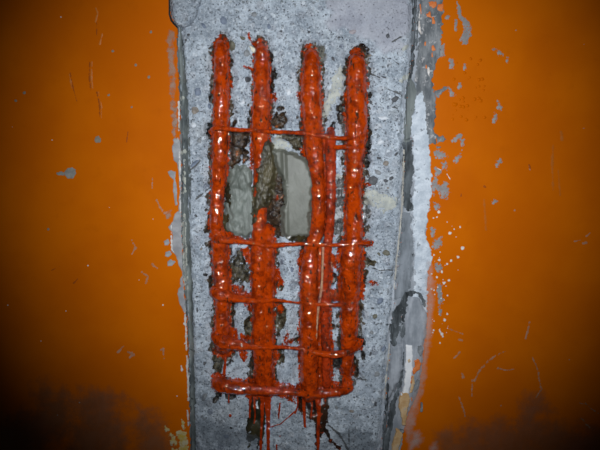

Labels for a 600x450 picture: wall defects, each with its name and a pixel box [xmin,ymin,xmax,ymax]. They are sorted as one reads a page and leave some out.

spalling [268,50,278,93]
spalling [228,119,251,169]
spalling [270,106,304,151]
spalling [330,104,346,129]
spalling [364,112,372,168]
peeling [57,167,76,179]
peeling [164,32,190,401]
spalling [267,173,284,239]
spalling [334,178,345,236]
peeling [377,0,472,450]
spalling [229,248,250,291]
spalling [275,302,287,334]